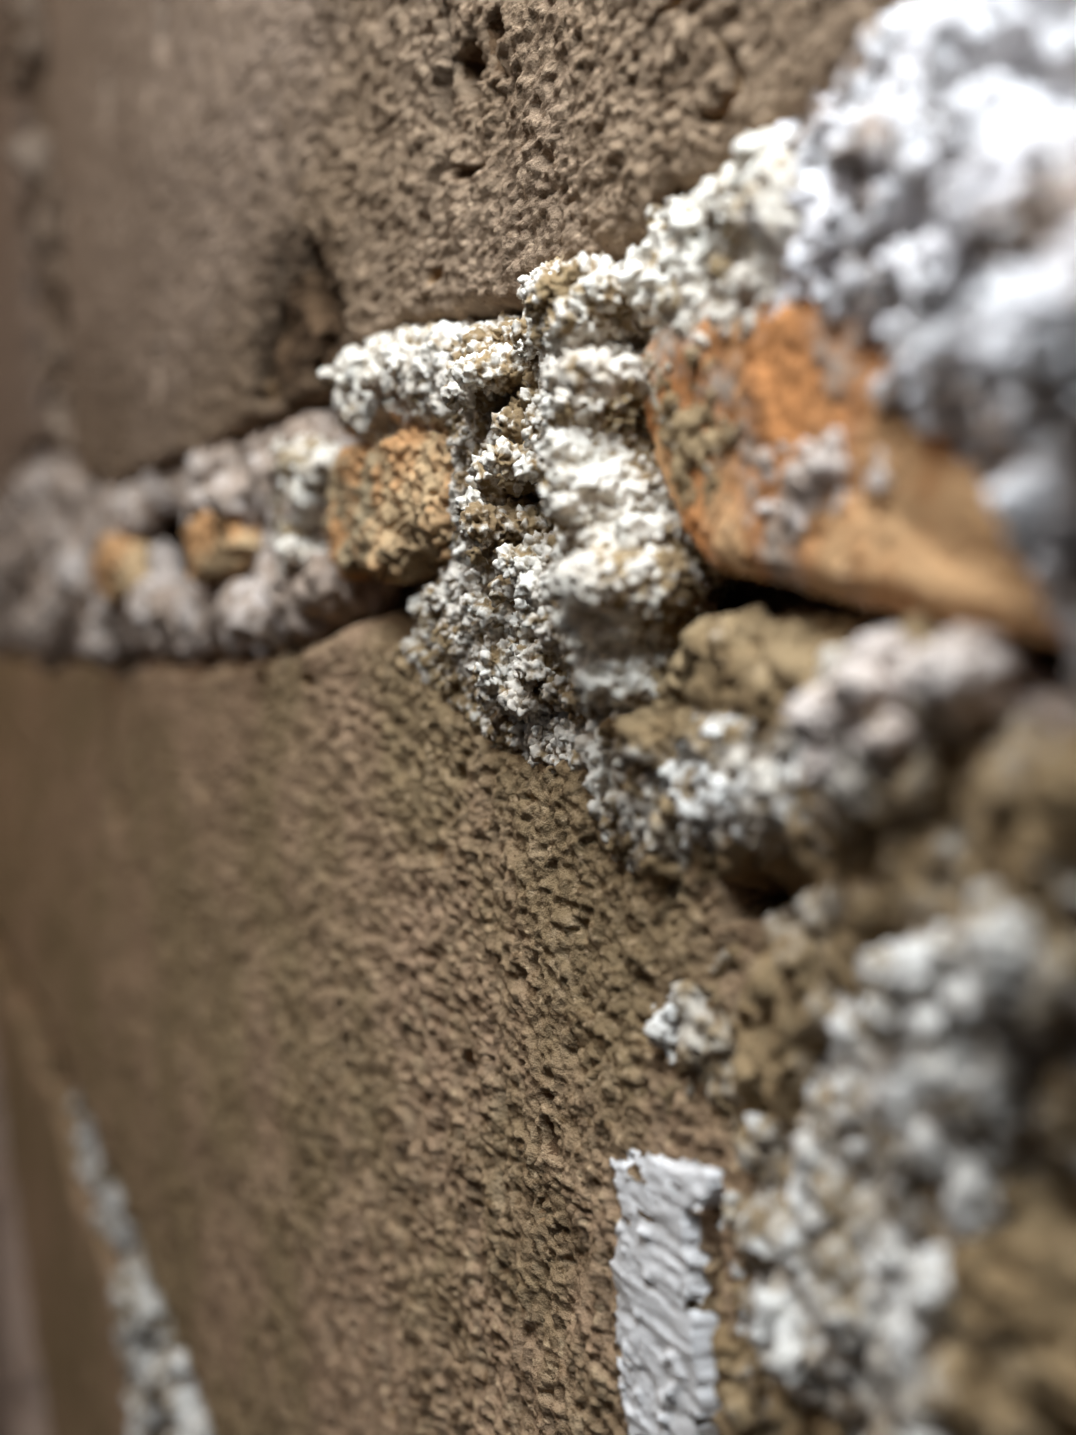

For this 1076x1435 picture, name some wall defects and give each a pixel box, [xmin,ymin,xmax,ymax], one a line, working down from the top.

spalling [4,0,49,107]
crack [451,20,510,105]
spalling [707,36,744,127]
crack [452,165,485,180]
spalling [426,268,443,284]
spalling [0,128,406,685]
spalling [740,888,802,917]
peeling [609,1148,724,1435]